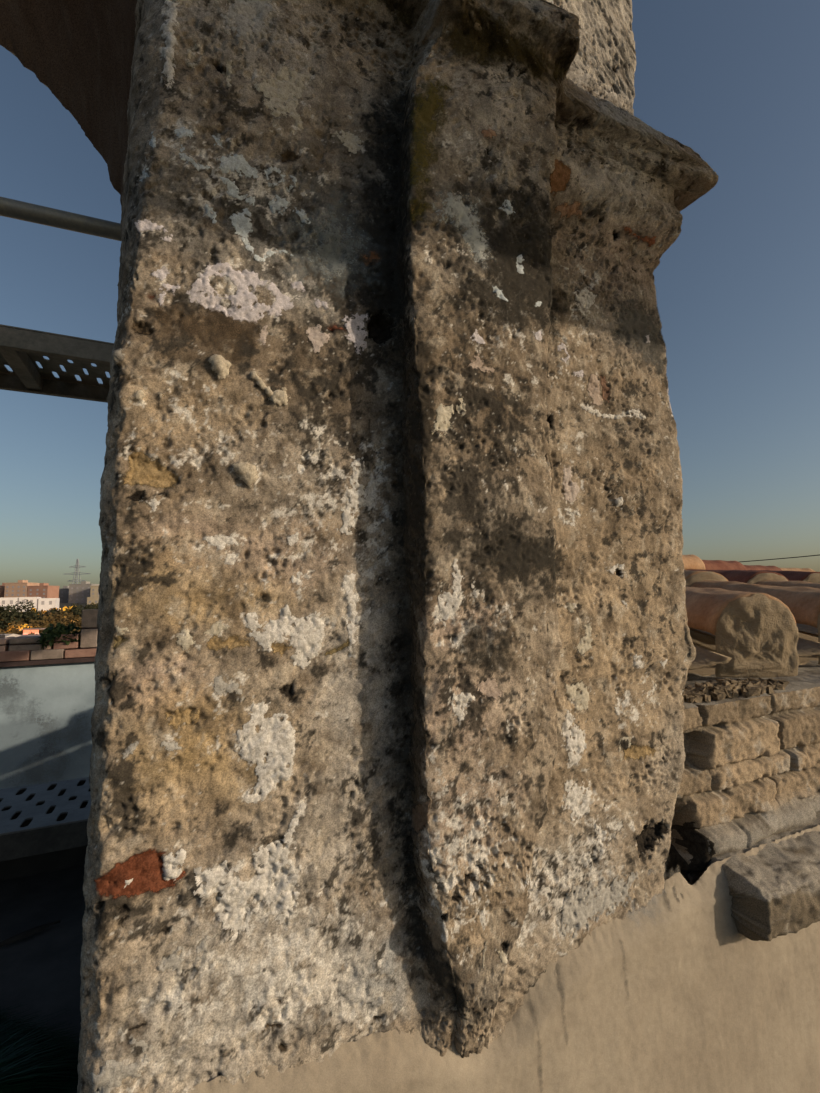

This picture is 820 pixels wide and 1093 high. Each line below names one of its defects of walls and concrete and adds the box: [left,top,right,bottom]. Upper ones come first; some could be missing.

peeling [94,801,307,975]